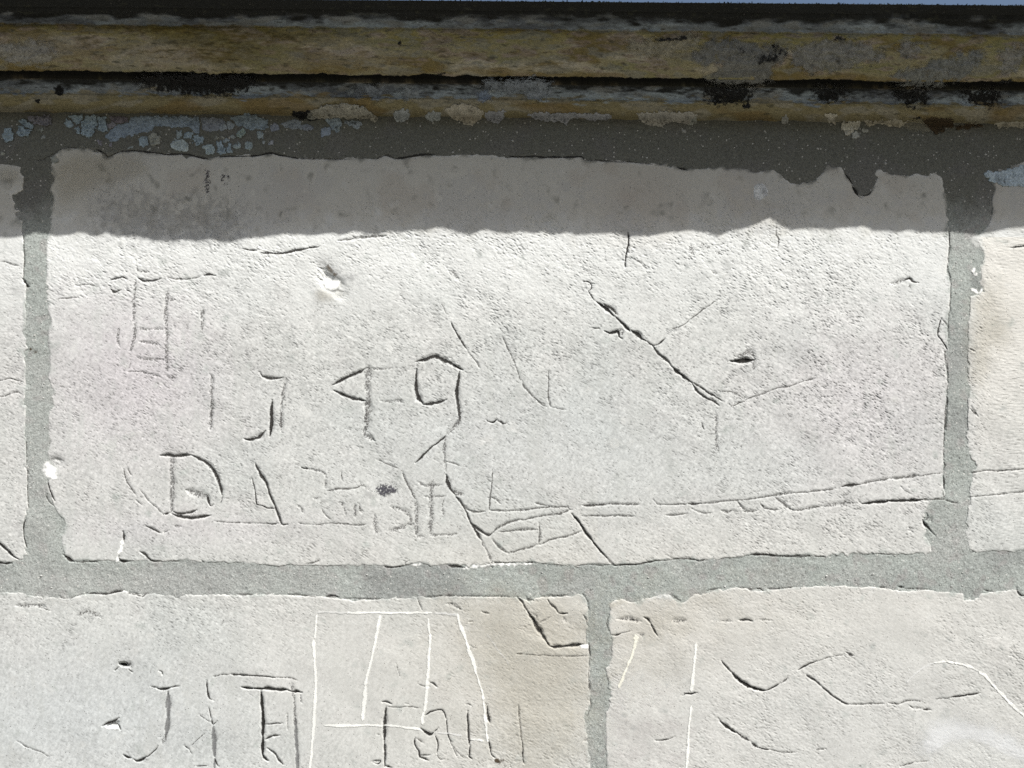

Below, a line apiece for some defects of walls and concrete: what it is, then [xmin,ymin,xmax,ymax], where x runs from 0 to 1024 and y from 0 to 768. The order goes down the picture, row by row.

crack [597,302,720,404]